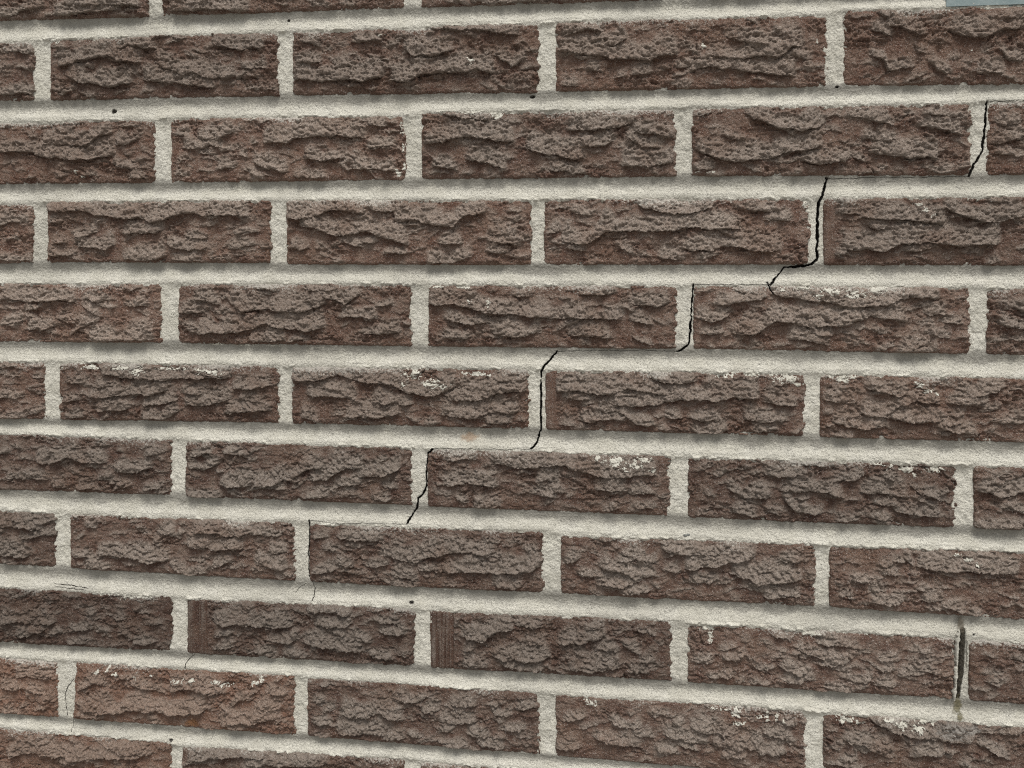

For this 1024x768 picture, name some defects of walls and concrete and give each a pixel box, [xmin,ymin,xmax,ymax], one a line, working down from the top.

crack [296,99,1024,601]